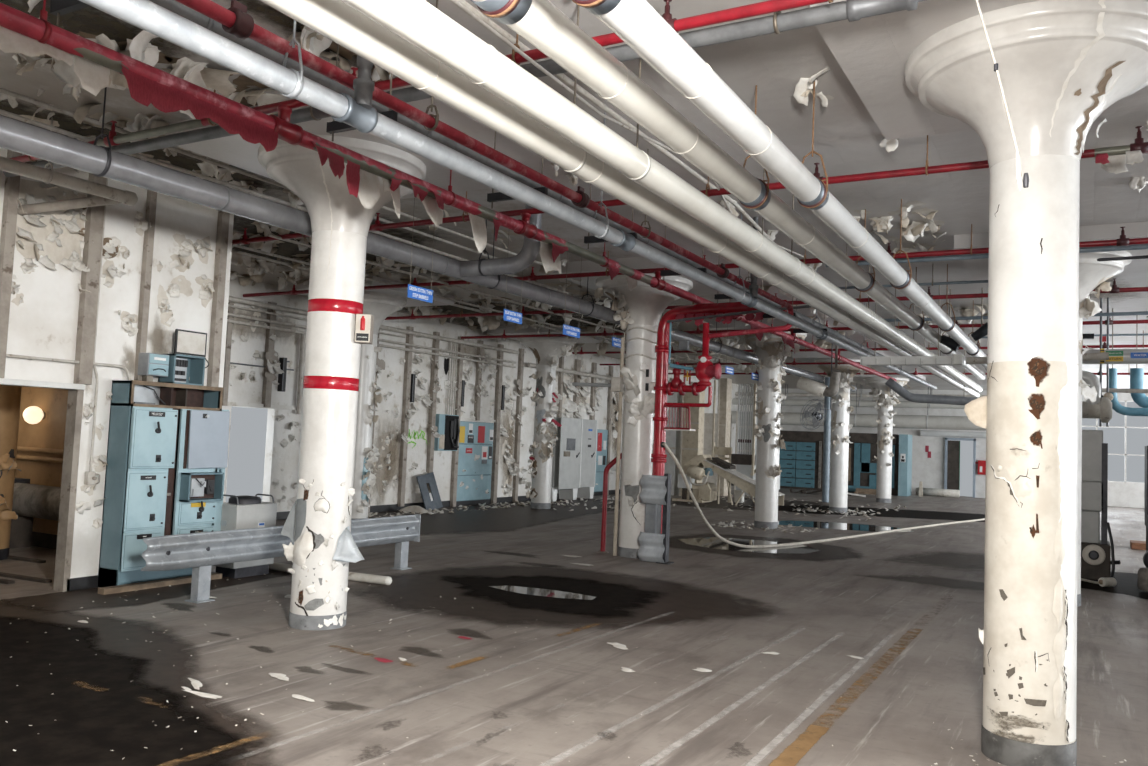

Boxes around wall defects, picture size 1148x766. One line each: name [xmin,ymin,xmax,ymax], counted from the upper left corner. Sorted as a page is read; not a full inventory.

peeling [0,26,290,198]
crack [1050,0,1106,137]
peeling [11,179,130,306]
peeling [853,201,951,253]
peeling [340,241,669,529]
corrosion [1027,357,1050,449]
crack [991,448,1040,508]
leakage [210,570,291,590]
spalling [272,468,349,628]
leakage [359,551,772,638]
leakage [0,583,269,766]
spalling [983,664,1024,719]